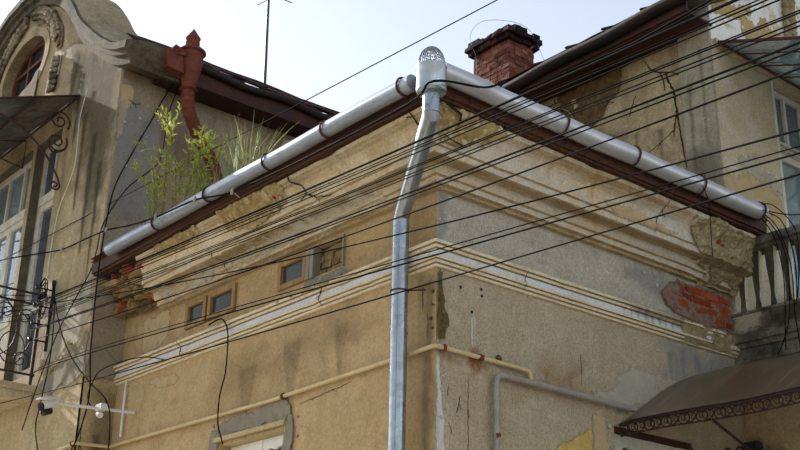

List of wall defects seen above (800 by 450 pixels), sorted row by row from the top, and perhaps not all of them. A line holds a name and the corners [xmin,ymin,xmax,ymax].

peeling [711,0,780,39]
water stain [69,53,117,273]
spalling [215,182,287,231]
spalling [437,102,507,148]
spalling [541,68,622,127]
crack [643,60,687,168]
peeling [39,279,92,374]
peeling [102,192,386,353]
spalling [428,271,449,340]
spalling [655,214,767,357]